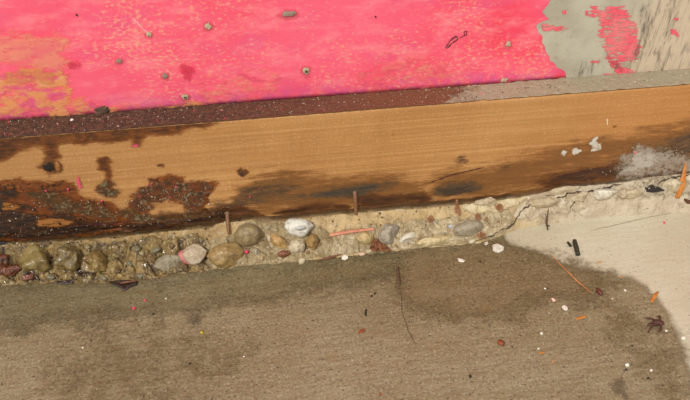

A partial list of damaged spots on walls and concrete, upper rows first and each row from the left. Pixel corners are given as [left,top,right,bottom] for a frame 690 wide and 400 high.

peeling [536,0,690,78]
damp [0,122,690,241]
crack [475,204,530,242]
crack [557,167,628,209]
damp [0,235,690,400]